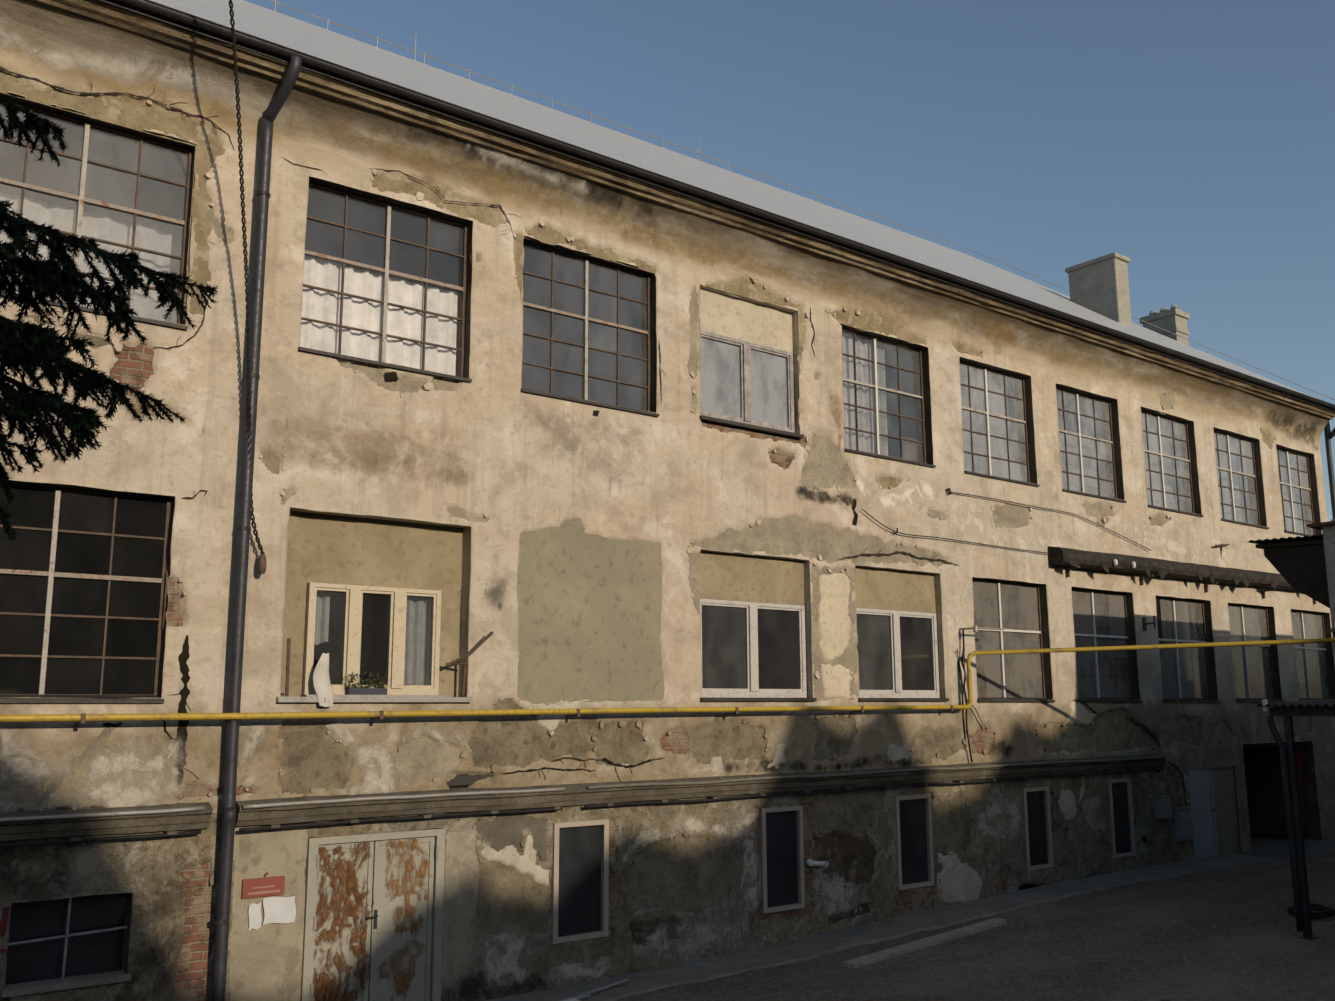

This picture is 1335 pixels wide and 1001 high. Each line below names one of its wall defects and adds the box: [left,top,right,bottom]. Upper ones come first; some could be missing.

flaking render [69,330,155,398]
flaking render [687,275,1052,764]
peeling [0,722,72,812]
peeling [73,740,256,810]
crack [163,635,199,789]
flaking render [239,698,599,796]
flaking render [660,714,786,773]
flaking render [457,813,551,916]
flaking render [933,792,1021,903]
rust [313,838,429,1001]